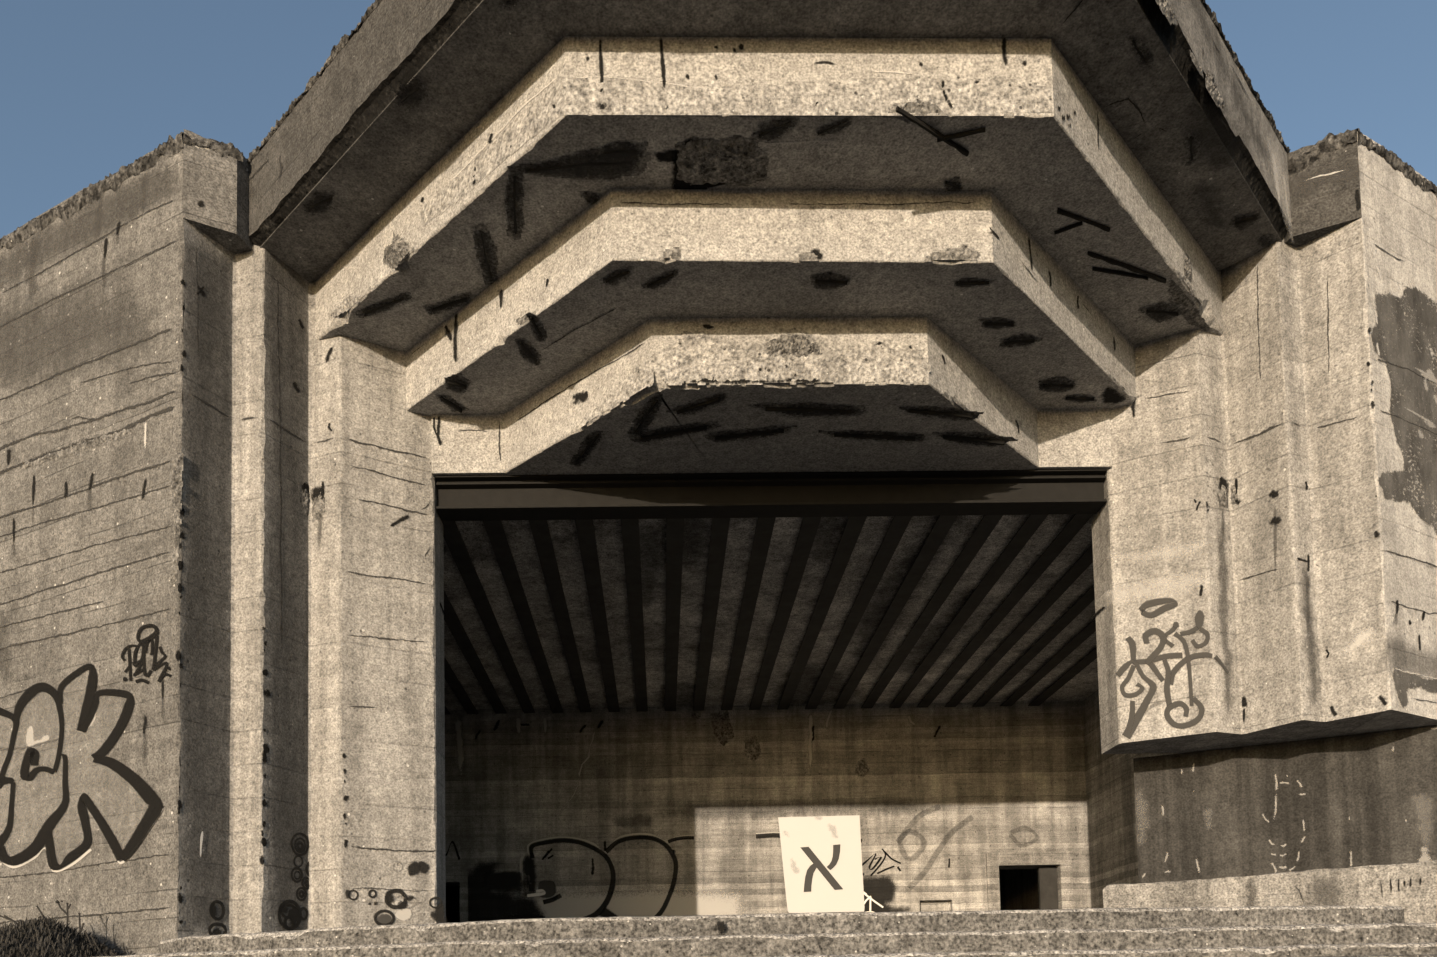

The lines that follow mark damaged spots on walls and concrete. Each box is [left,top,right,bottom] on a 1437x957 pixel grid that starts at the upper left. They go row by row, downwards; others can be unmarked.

spalling [419,57,1076,225]
spalling [383,232,414,268]
spalling [663,247,681,260]
spalling [798,249,823,261]
spalling [924,244,981,262]
water stain [1393,669,1437,708]